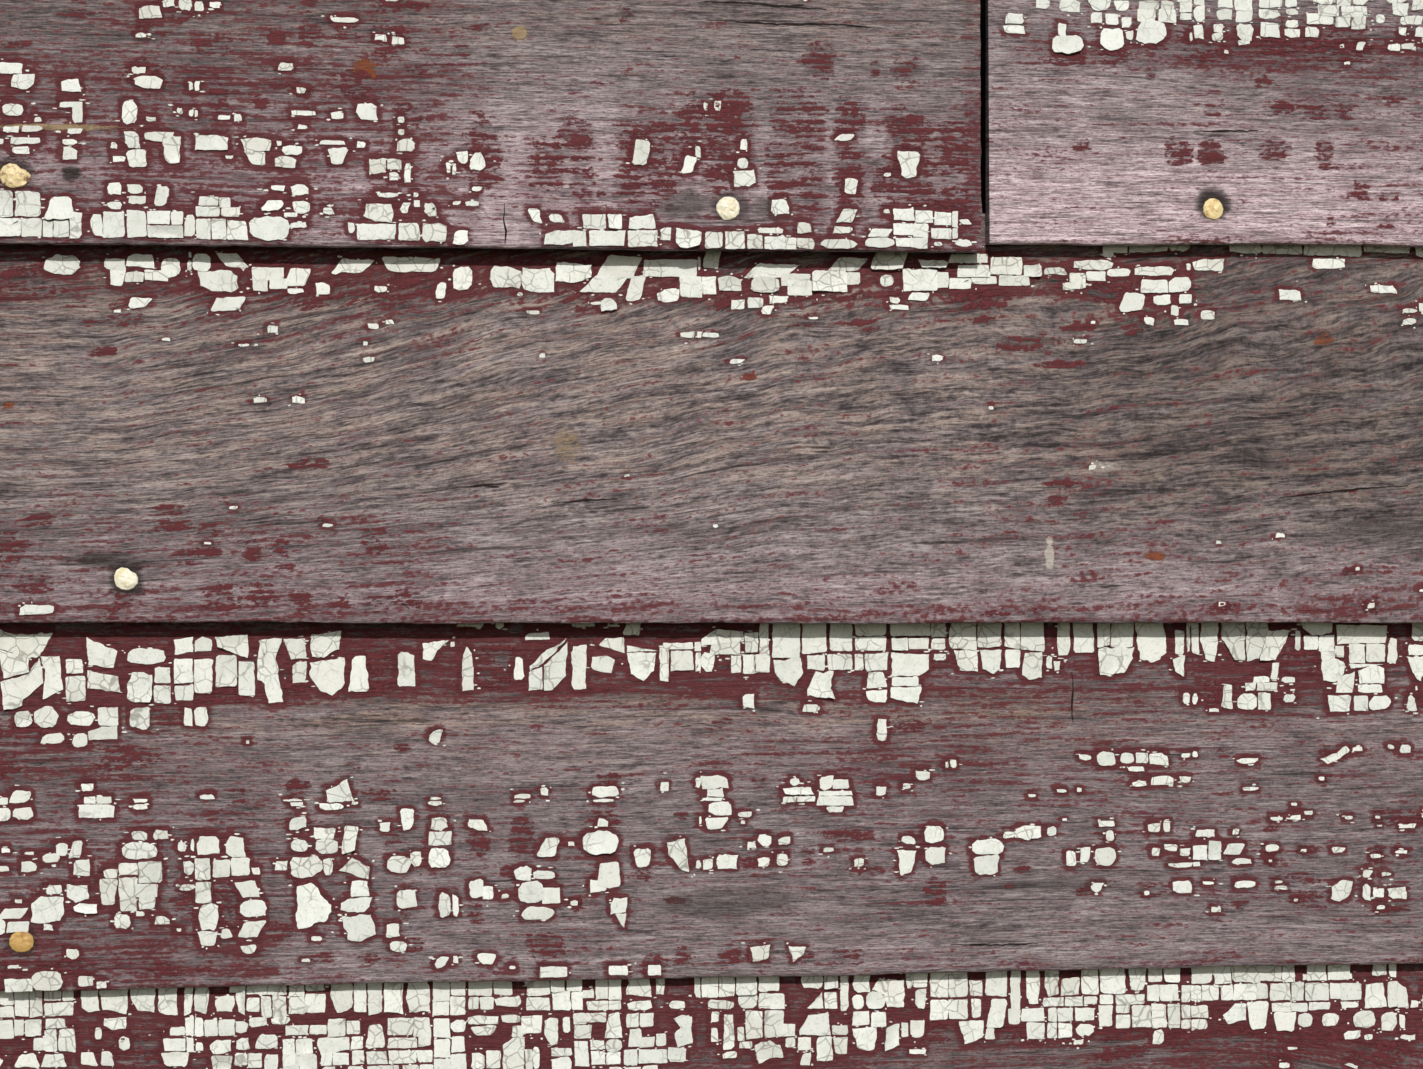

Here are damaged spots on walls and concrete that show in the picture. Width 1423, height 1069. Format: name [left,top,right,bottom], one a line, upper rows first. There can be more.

peeling [1003,0,1423,65]
peeling [0,59,1423,328]
peeling [0,629,369,747]
peeling [397,623,507,691]
peeling [504,600,1423,719]
peeling [776,775,854,812]
peeling [1075,749,1198,787]
peeling [0,777,491,954]
peeling [438,782,651,927]
peeling [667,833,799,877]
peeling [1142,819,1279,913]
peeling [0,942,1423,1069]